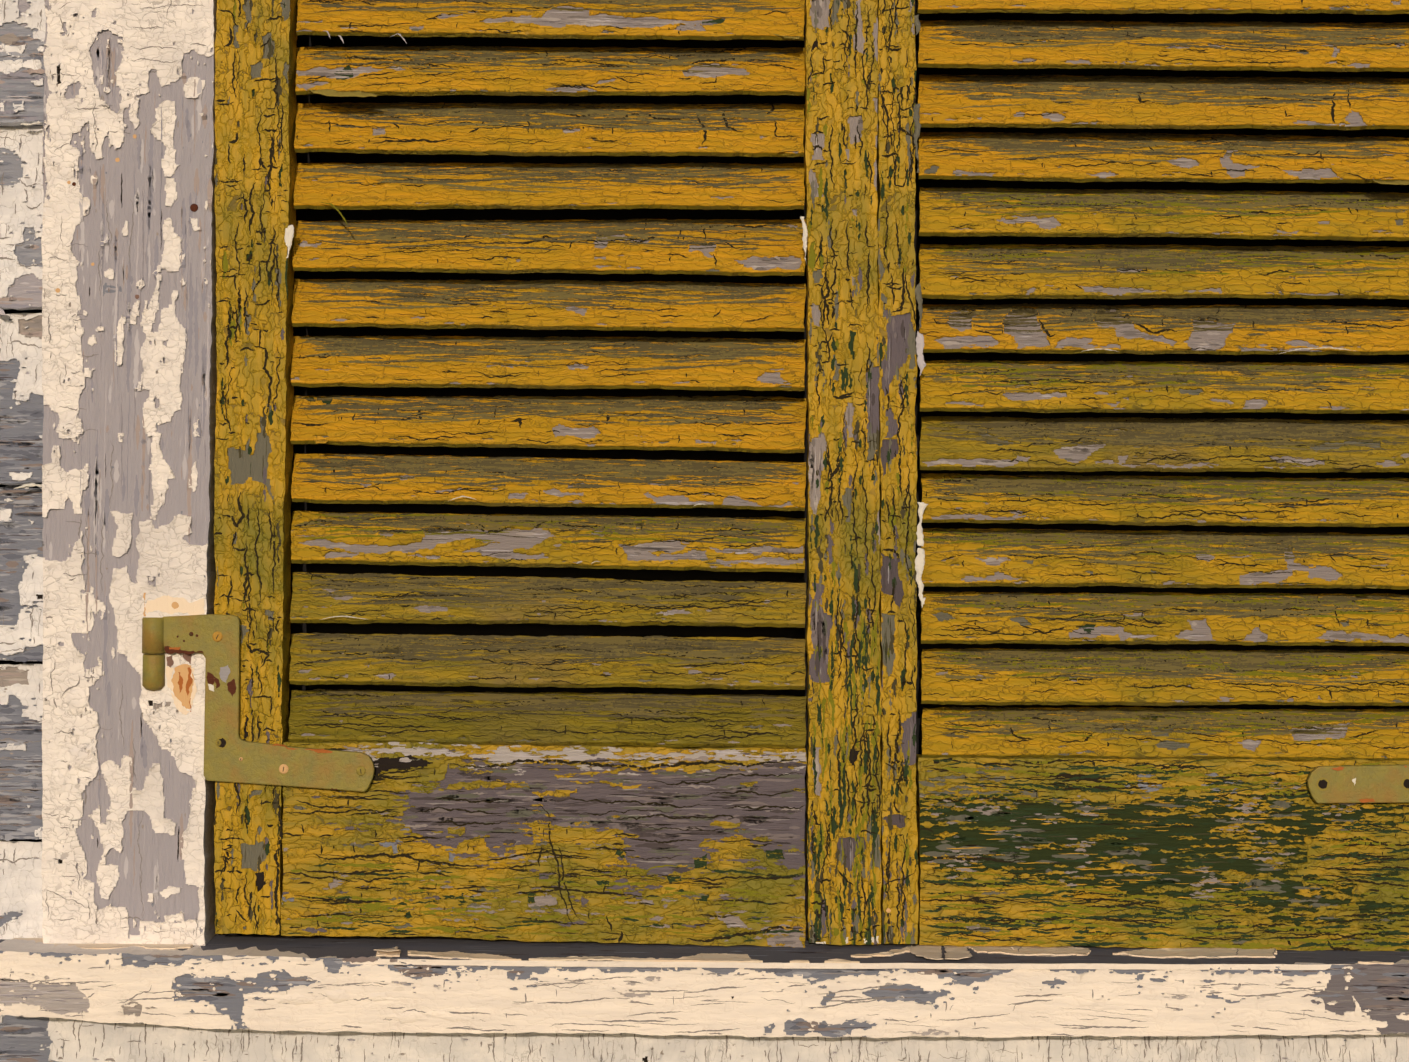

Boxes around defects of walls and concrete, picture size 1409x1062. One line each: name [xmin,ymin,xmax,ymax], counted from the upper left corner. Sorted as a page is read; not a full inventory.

crack [2,1,70,37]
peeling [409,6,733,34]
peeling [232,0,406,106]
crack [75,102,130,150]
crack [126,0,346,440]
crack [0,131,137,780]
peeling [644,480,797,508]
crack [212,0,1409,956]
peeling [276,521,581,564]
peeling [1196,548,1342,585]
peeling [1069,613,1157,641]
crack [0,816,198,936]